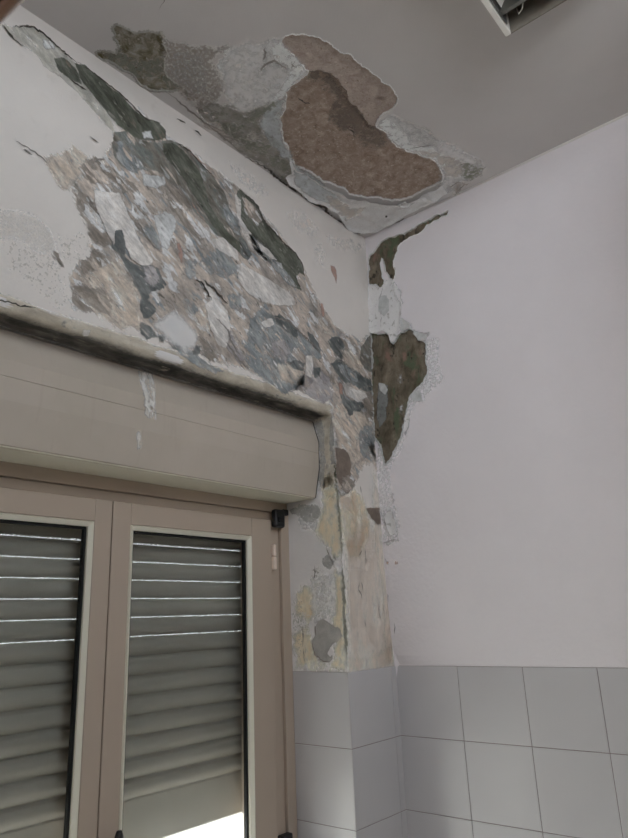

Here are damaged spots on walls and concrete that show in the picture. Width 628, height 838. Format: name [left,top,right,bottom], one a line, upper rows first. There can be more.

damp [127,202,238,279]
peeling [2,23,484,502]
damp [0,230,392,670]
flaking render [366,507,381,525]
flaking render [294,566,342,662]